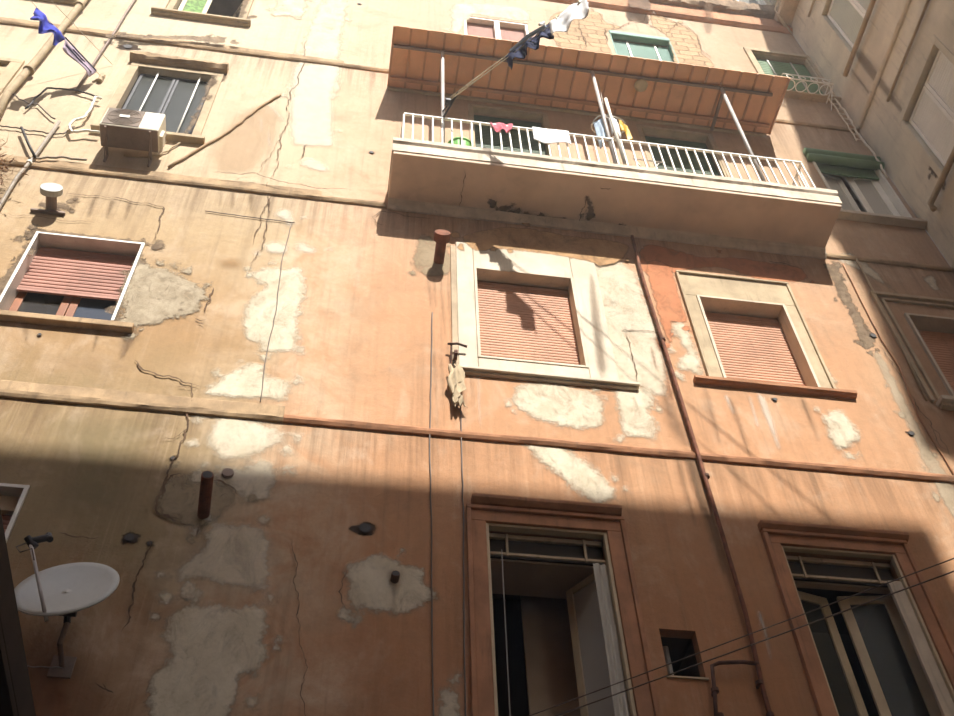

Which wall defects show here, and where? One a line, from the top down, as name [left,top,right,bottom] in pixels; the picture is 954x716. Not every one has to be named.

flaking render [281,0,361,146]
flaking render [549,8,621,54]
flaking render [650,11,714,67]
crack [222,41,345,274]
flaking render [206,243,306,400]
flaking render [448,196,814,442]
crack [135,360,201,537]
flaking render [209,417,301,501]
flaking render [526,444,616,503]
crack [121,541,151,632]
flaking render [147,515,281,716]
flaking render [338,549,436,623]